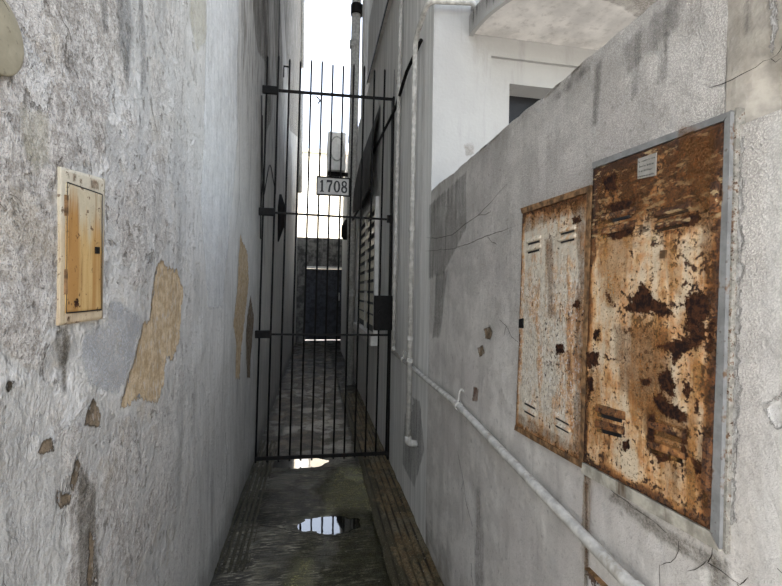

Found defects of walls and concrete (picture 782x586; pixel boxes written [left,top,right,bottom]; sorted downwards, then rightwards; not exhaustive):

crack [709,47,782,88]
spalling [233,234,254,379]
spalling [120,260,183,408]
spalling [478,327,492,357]
spalling [85,399,101,428]
spalling [38,437,55,455]
spalling [57,456,80,509]
crack [611,490,679,582]
crack [690,548,748,586]